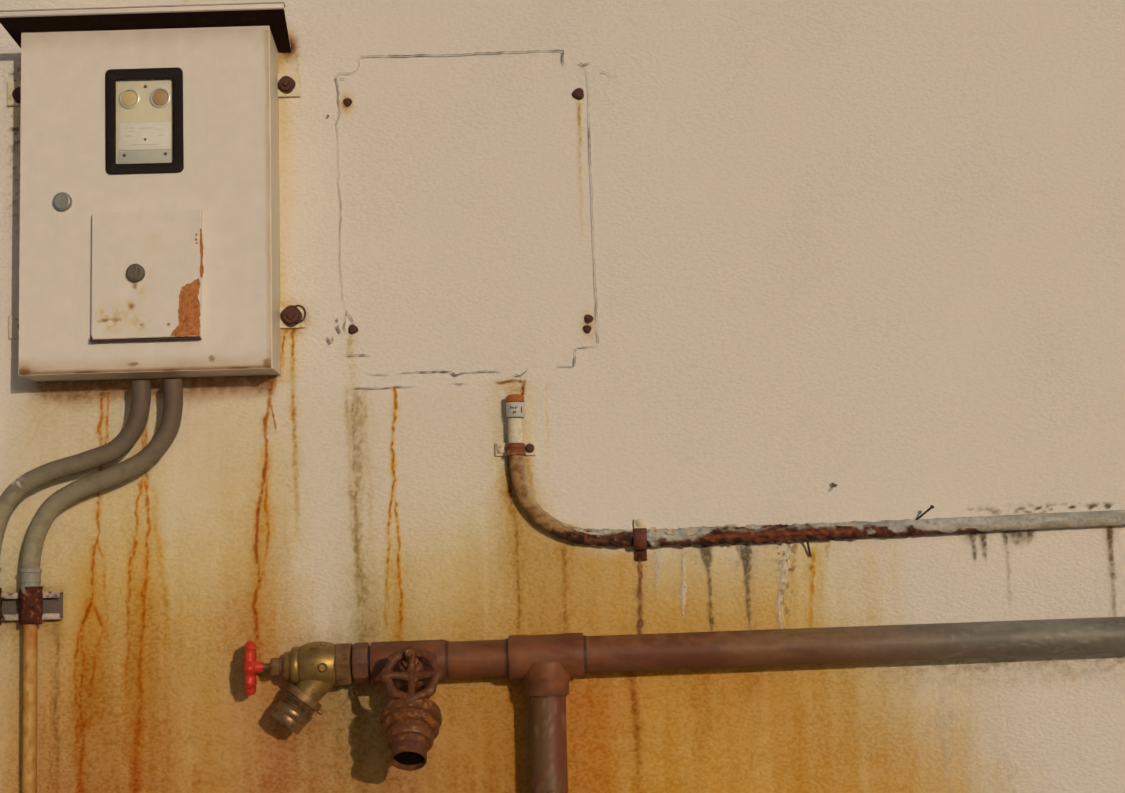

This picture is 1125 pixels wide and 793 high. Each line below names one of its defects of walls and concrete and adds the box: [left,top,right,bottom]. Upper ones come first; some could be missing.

crack [335,49,618,389]